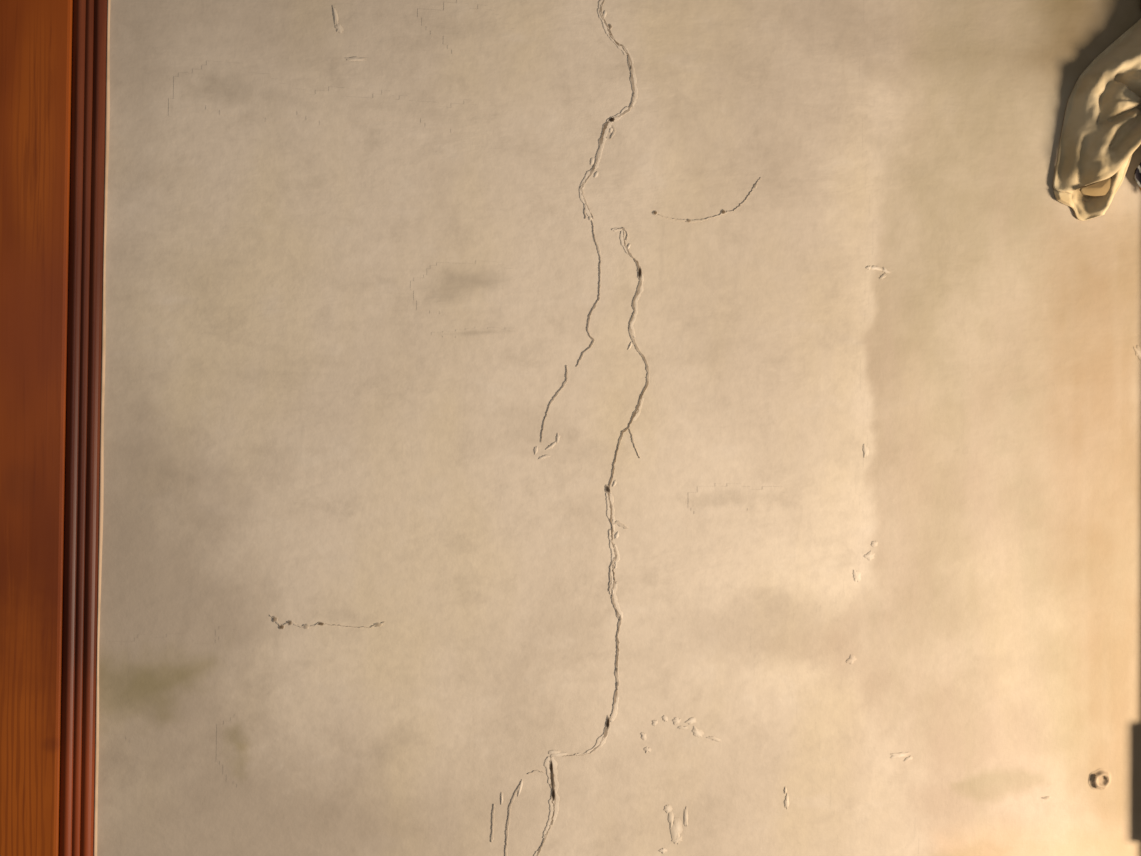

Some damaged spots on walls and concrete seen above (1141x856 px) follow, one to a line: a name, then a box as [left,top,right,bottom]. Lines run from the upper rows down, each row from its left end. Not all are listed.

crack [653,177,762,223]
crack [490,0,650,856]
damp [99,626,240,743]
damp [216,714,258,788]